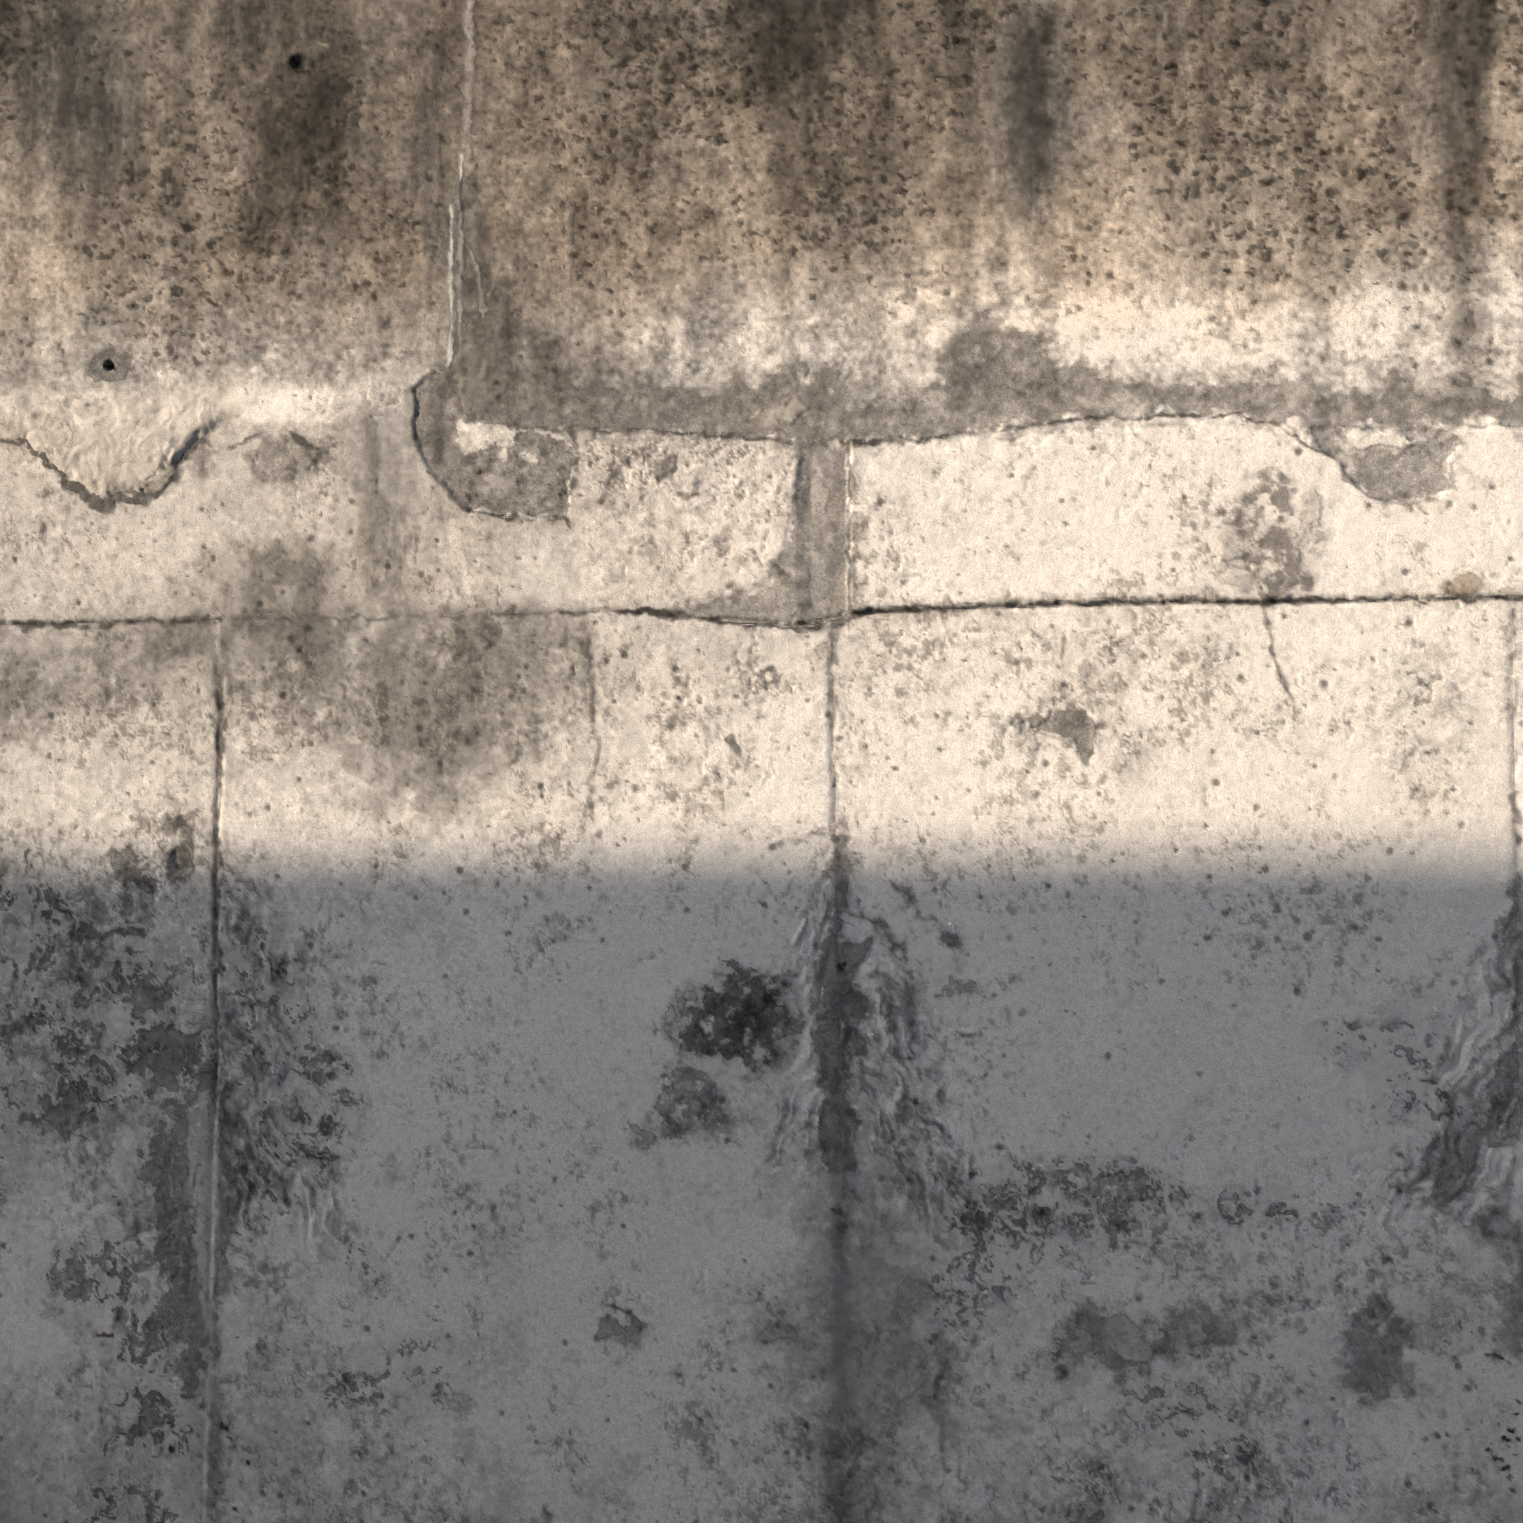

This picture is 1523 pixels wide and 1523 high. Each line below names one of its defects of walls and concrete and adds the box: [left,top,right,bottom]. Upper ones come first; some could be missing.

damp [0,0,117,180]
damp [74,174,253,355]
damp [191,6,359,301]
damp [409,0,569,410]
damp [575,0,847,161]
mould [828,170,926,259]
damp [915,0,994,63]
damp [1008,26,1050,218]
damp [1155,0,1523,295]
spalling [190,444,209,478]
spalling [409,310,1523,520]
crack [930,1337,958,1472]